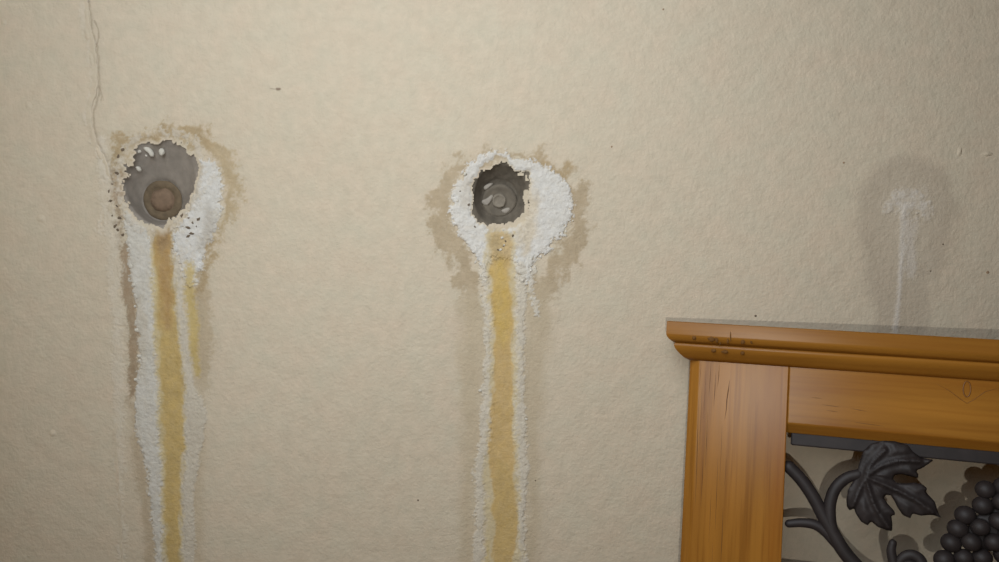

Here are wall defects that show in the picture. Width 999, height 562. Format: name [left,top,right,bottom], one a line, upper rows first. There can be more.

spalling [121,140,199,229]
damp [92,114,253,562]
rust [146,218,205,562]
spalling [472,161,531,226]
rust [476,172,530,562]
damp [422,138,600,562]
damp [844,148,973,336]